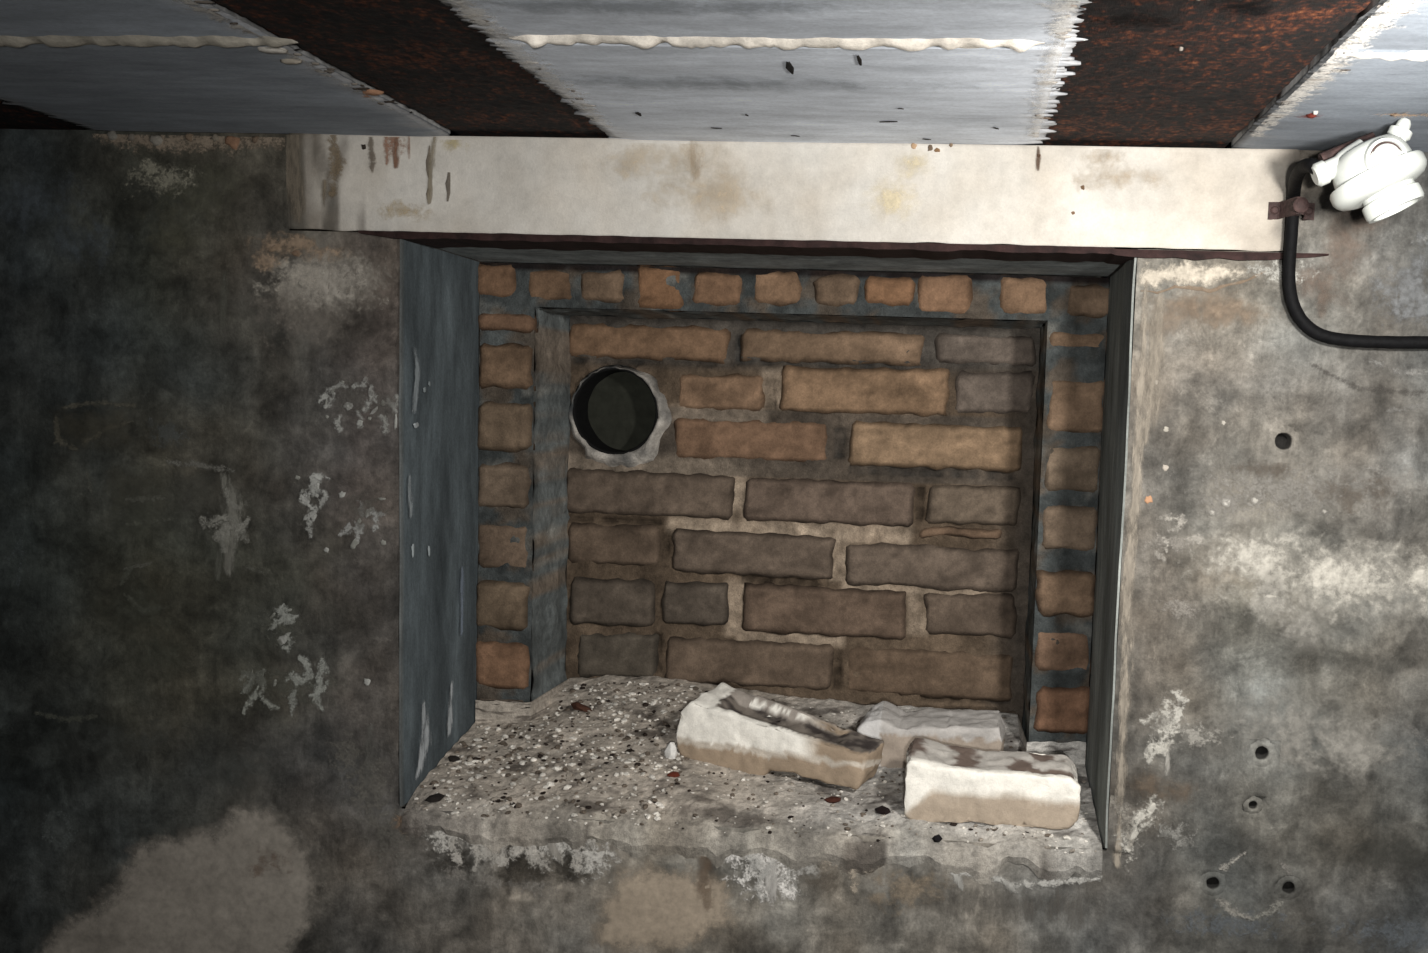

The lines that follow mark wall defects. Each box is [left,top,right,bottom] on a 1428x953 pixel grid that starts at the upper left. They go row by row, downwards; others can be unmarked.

corrosion [258,47,302,64]
corrosion [362,89,384,97]
damp [318,352,431,433]
damp [167,460,249,580]
damp [295,473,346,533]
damp [338,497,386,549]
damp [1213,534,1428,611]
damp [241,604,334,715]
damp [416,702,429,779]
damp [1273,709,1382,770]